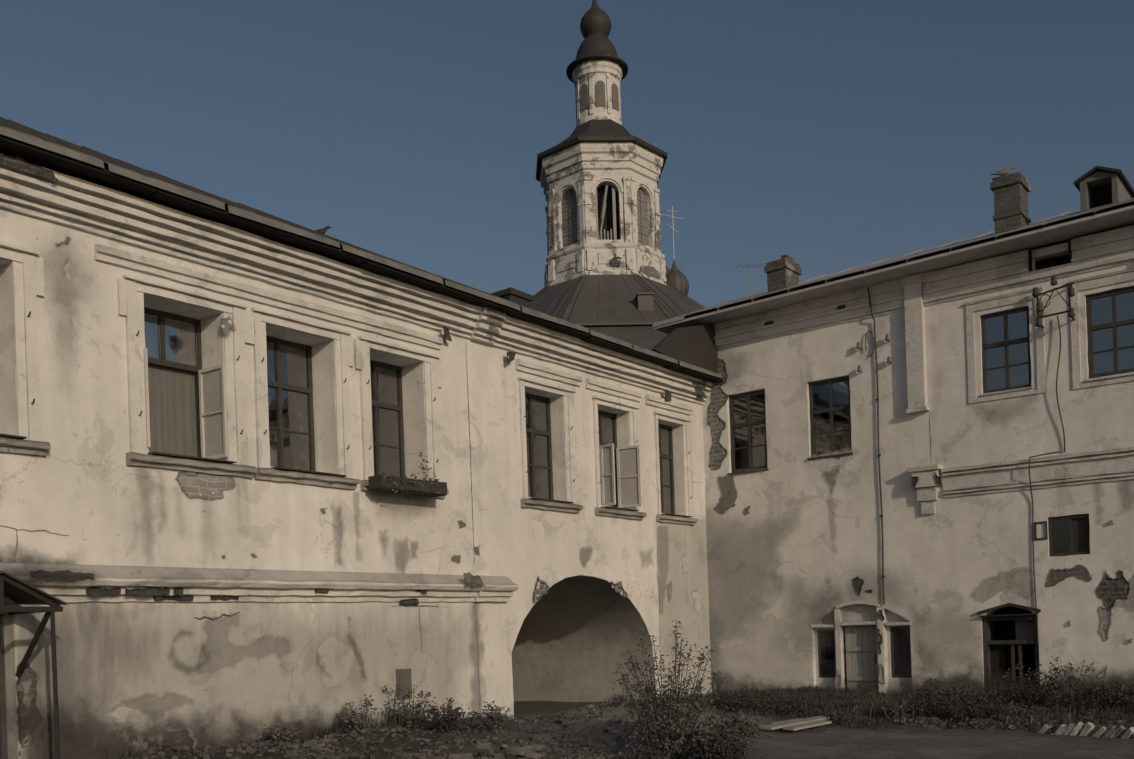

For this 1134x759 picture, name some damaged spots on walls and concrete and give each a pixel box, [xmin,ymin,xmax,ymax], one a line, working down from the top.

spalling [640,266,661,279]
flaking render [693,359,750,515]
spalling [175,471,236,500]
crack [0,525,67,557]
flaking render [1046,565,1130,641]
spalling [16,661,40,755]